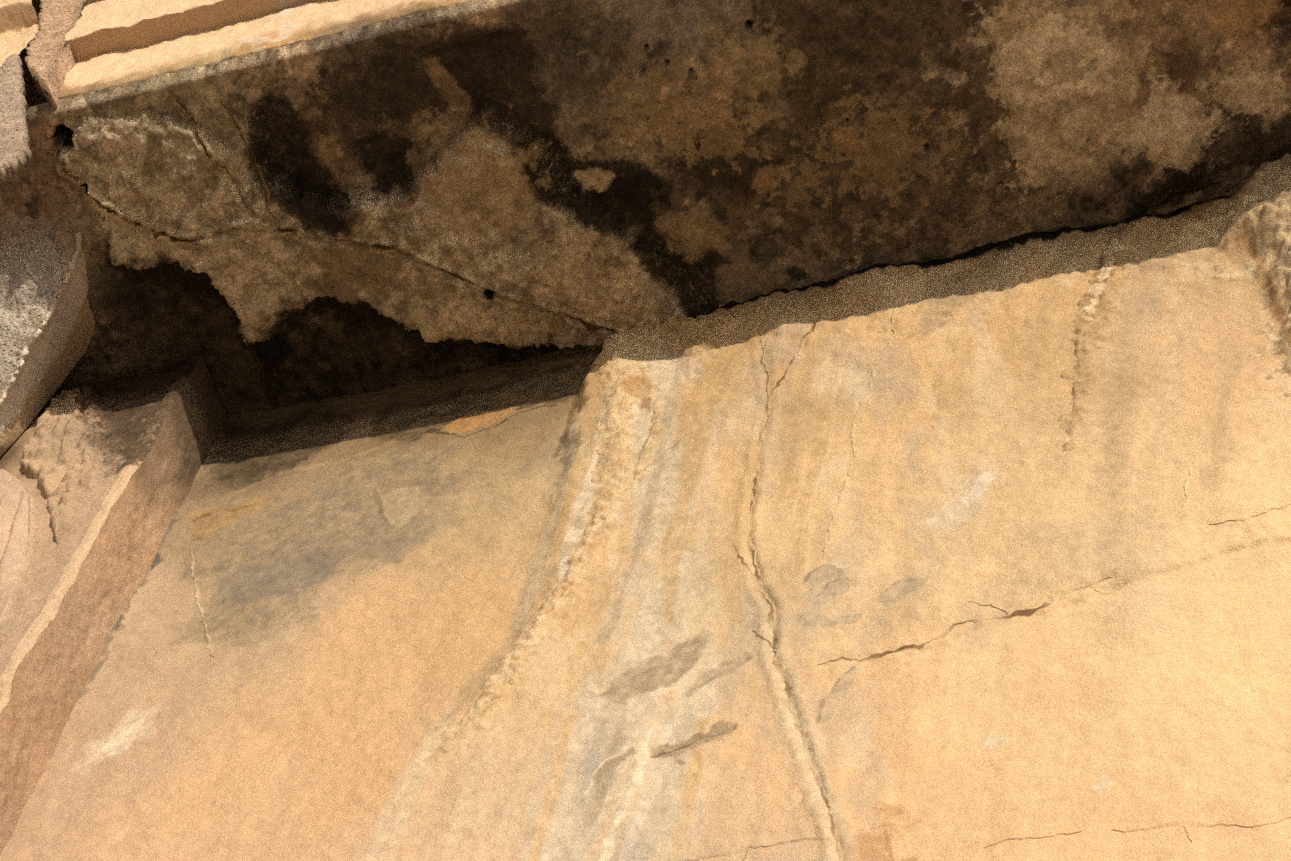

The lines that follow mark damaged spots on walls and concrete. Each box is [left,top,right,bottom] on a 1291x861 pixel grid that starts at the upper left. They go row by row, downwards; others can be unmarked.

crack [68,90,616,334]
damp [237,0,1062,345]
crack [666,169,1230,861]
damp [878,99,1291,656]
damp [1156,36,1210,94]
damp [1236,0,1291,67]